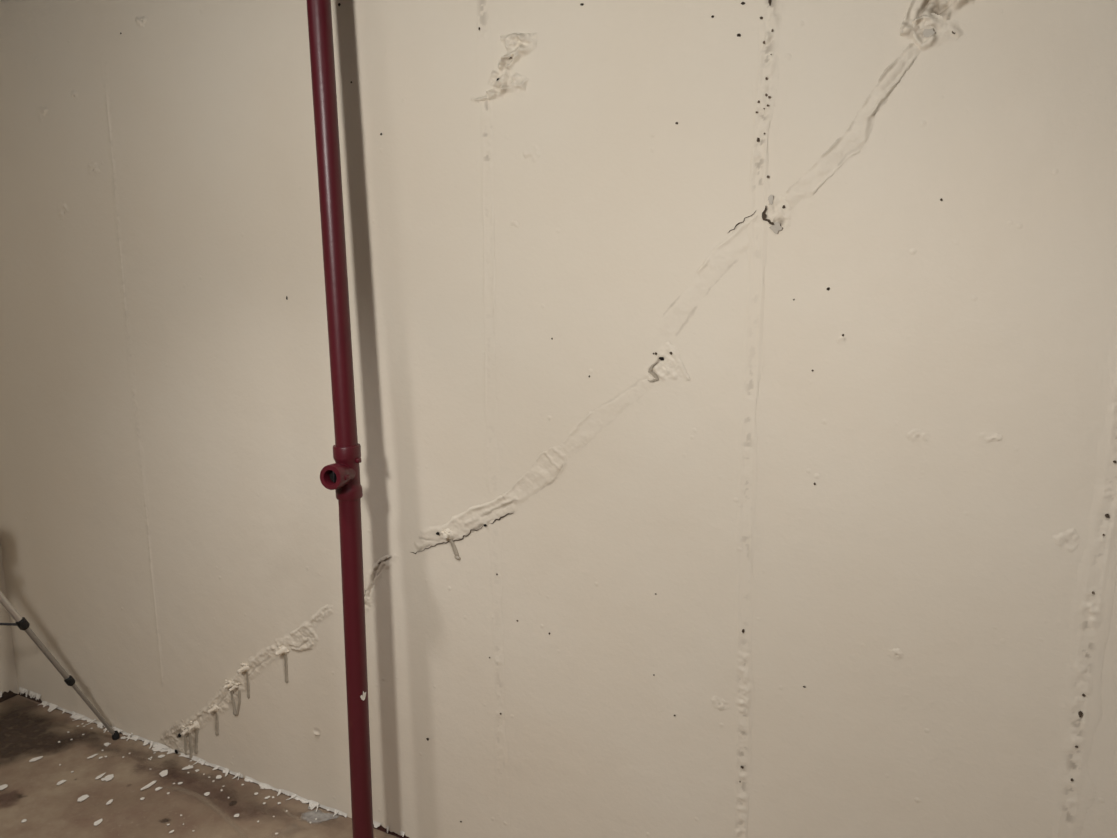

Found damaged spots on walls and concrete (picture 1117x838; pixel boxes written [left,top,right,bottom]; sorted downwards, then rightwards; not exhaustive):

crack [655,0,978,343]
crack [364,375,656,614]
crack [158,604,334,759]